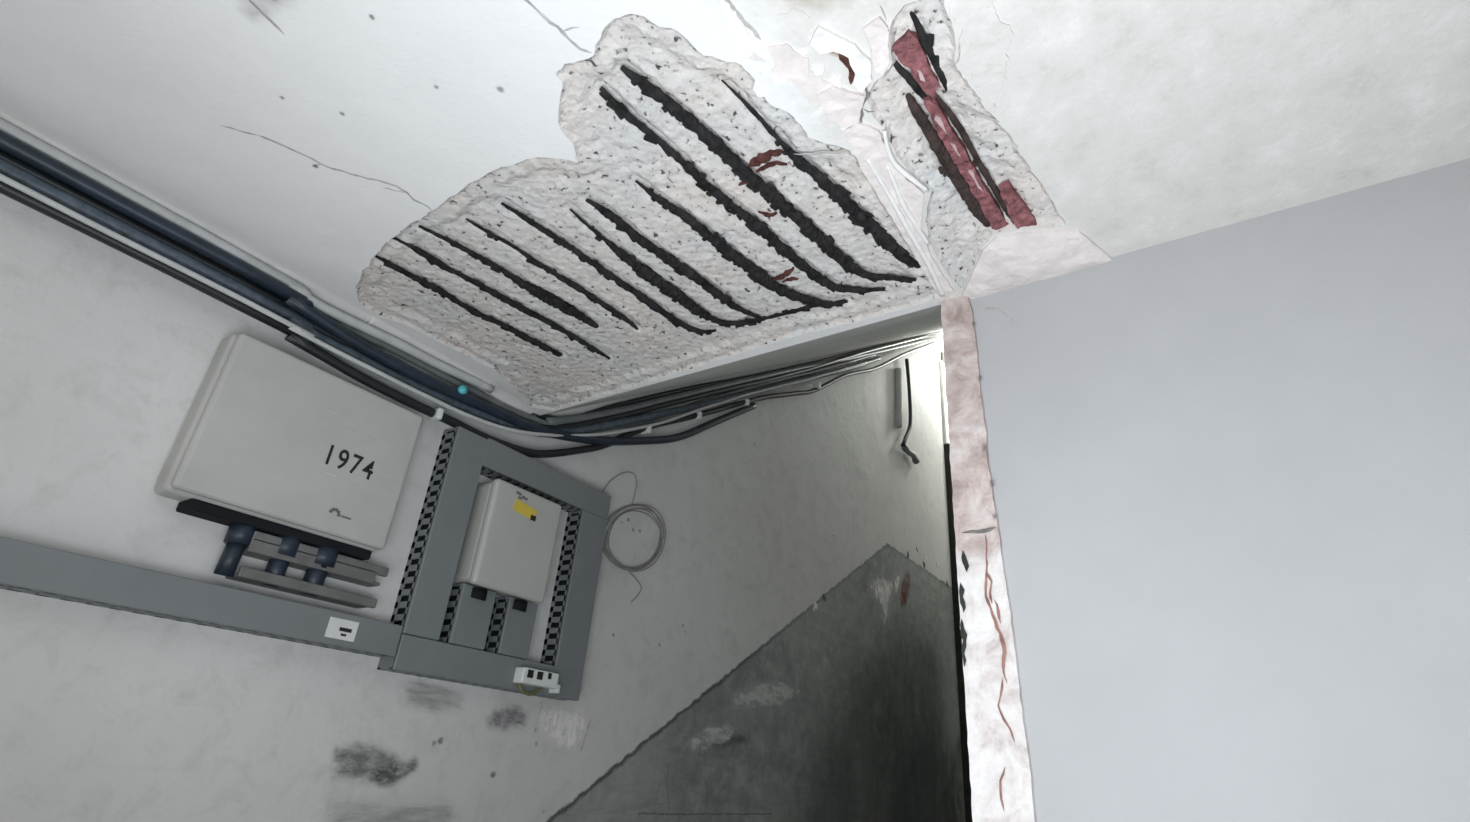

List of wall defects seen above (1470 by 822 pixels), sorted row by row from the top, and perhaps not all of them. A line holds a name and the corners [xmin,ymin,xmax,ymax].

crack [524,0,591,53]
crack [223,126,434,212]
spalling [356,0,1066,411]
corrosion [738,149,787,186]
corrosion [772,267,799,283]
crack [959,527,1015,810]